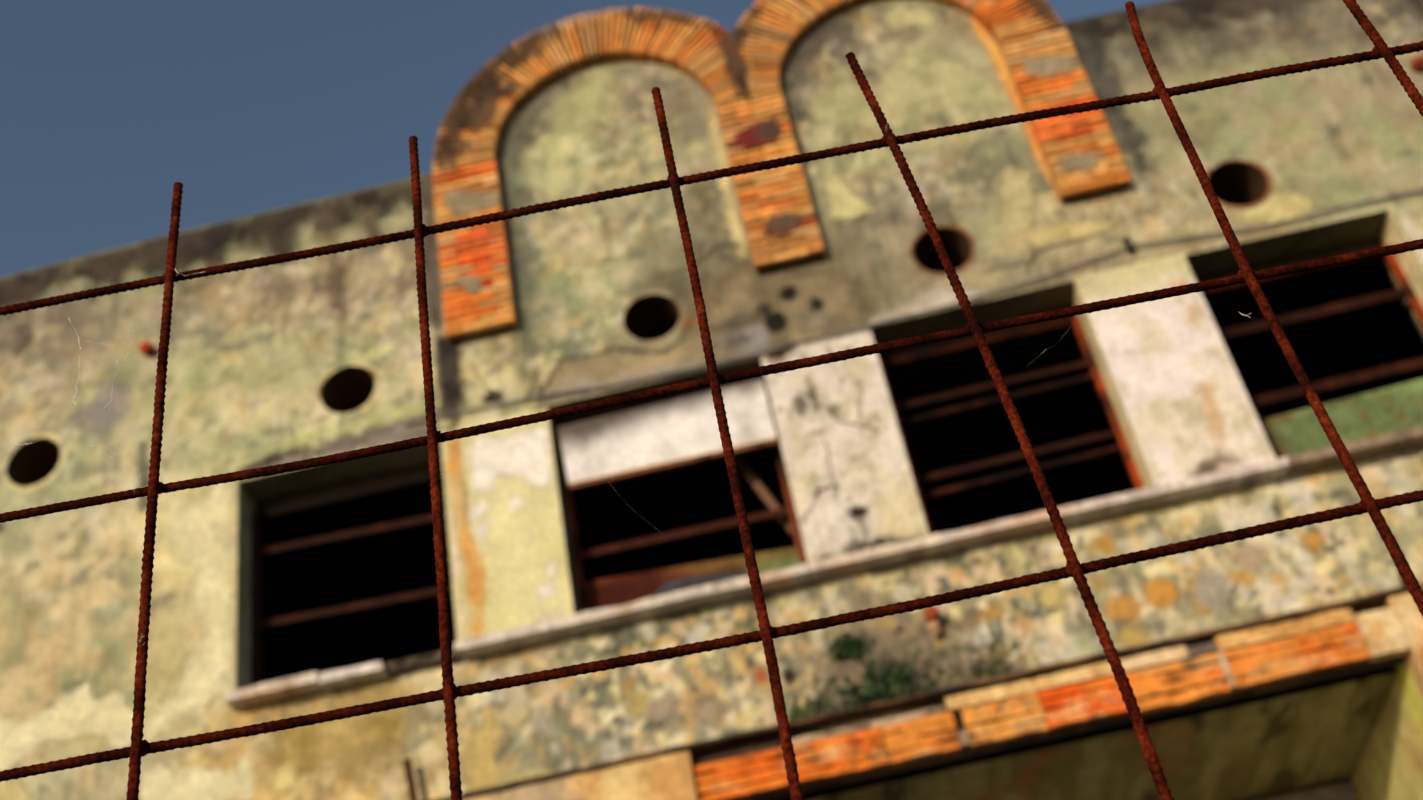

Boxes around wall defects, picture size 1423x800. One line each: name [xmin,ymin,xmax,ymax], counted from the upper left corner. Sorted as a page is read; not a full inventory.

water stain [1017,0,1423,185]
spalling [703,177,874,361]
peeling [1227,190,1315,226]
water stain [129,439,150,513]
crack [803,397,880,518]
corrosion [444,439,493,641]
peeling [143,482,237,743]
water stain [770,578,1040,739]
spalling [1121,607,1411,714]
peeling [0,682,133,771]
spalling [692,736,789,800]
spalling [791,662,1129,786]